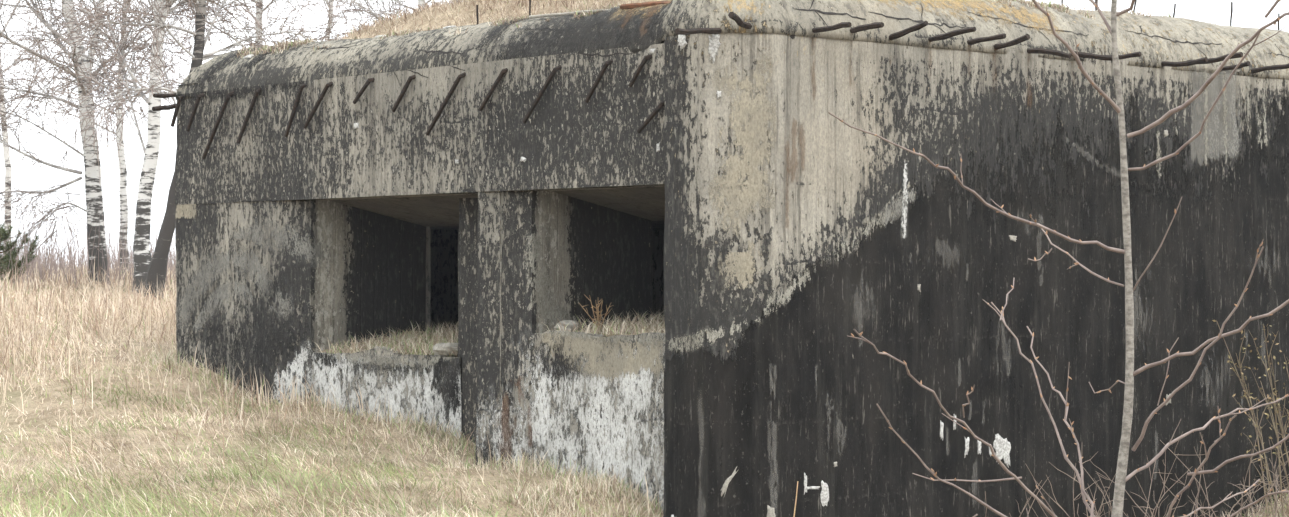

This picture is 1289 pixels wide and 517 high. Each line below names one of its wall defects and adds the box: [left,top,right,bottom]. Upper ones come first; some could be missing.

rust [878,0,1060,34]
water stain [176,44,308,104]
water stain [176,66,1289,517]
spalling [327,353,460,368]
peeling [940,415,1011,468]
peeling [720,467,737,497]
peeling [804,473,829,507]